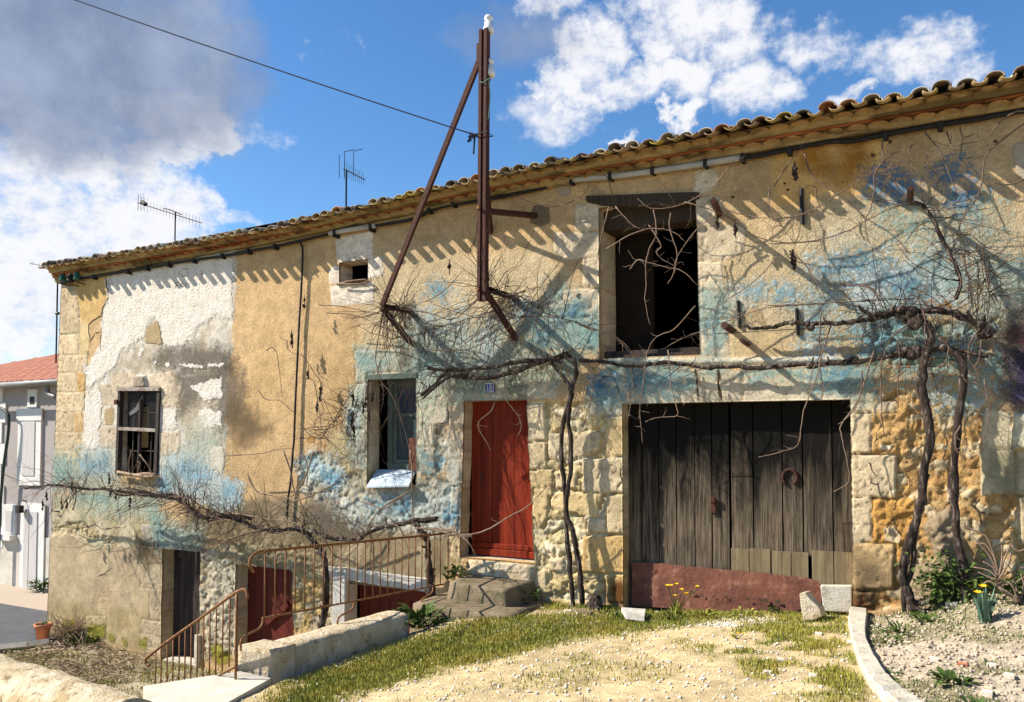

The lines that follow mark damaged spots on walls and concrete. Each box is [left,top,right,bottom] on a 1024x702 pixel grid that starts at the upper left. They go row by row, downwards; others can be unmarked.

water stain [52,343,263,559]
peeling [82,243,242,451]
peeling [209,442,237,484]
spalling [883,526,900,544]